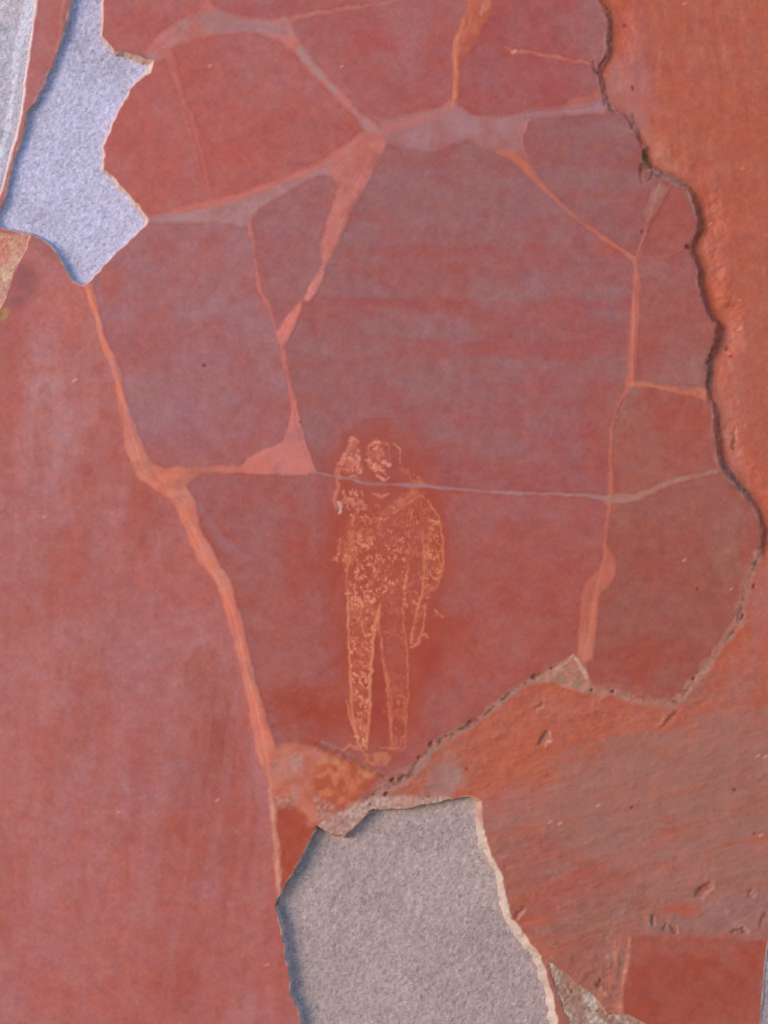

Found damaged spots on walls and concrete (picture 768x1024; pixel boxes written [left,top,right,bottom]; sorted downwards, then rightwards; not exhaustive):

spalling [0,0,153,306]
crack [81,0,768,896]
spalling [273,746,646,1024]
spalling [535,729,554,749]